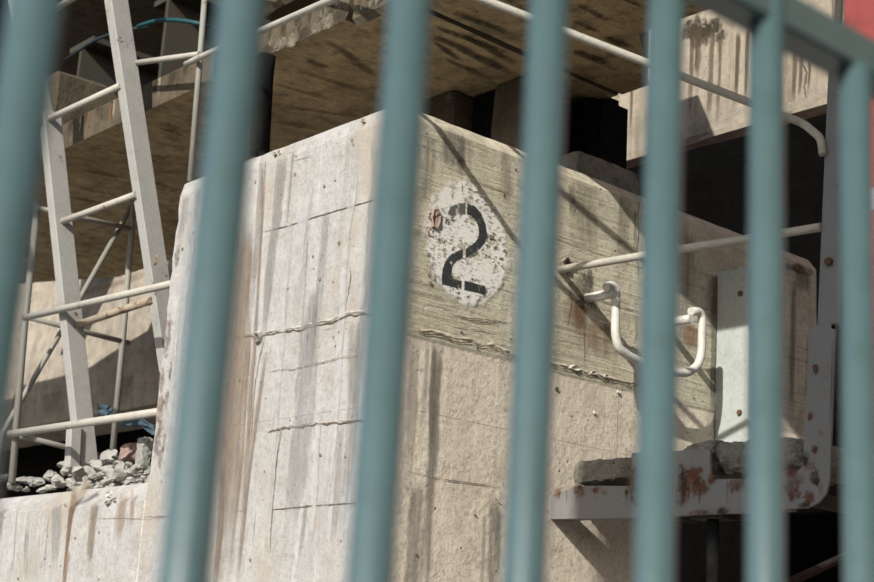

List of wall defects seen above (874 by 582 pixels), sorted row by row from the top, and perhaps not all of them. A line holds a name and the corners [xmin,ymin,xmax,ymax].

leakage [690,28,749,97]
leakage [787,55,818,91]
spalling [426,207,441,237]
crack [415,303,512,355]
crack [555,294,638,431]
crack [244,266,365,551]
leakage [409,352,442,580]
corrosion [677,464,727,515]
corrosion [785,446,820,508]
corrosion [63,479,90,582]
corrosion [88,506,97,555]